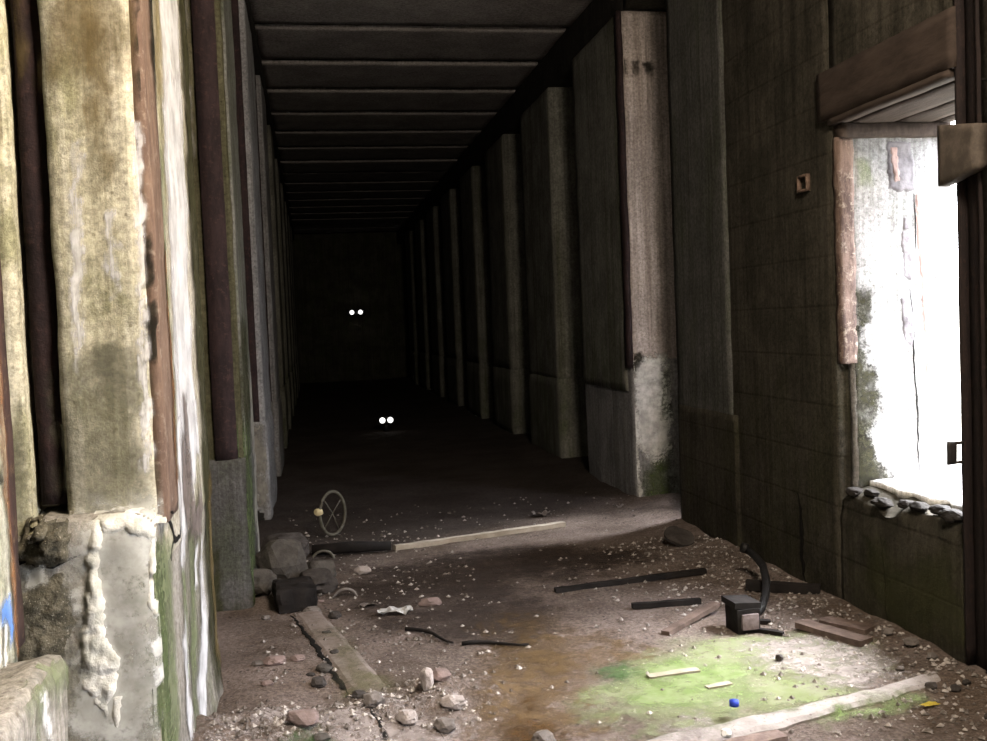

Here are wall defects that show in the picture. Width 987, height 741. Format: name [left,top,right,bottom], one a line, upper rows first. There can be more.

corrosion [136,0,156,89]
water stain [68,0,223,741]
corrosion [144,239,179,477]
corrosion [0,367,19,654]
spalling [18,504,76,690]
crack [19,554,81,569]
crack [168,511,182,561]